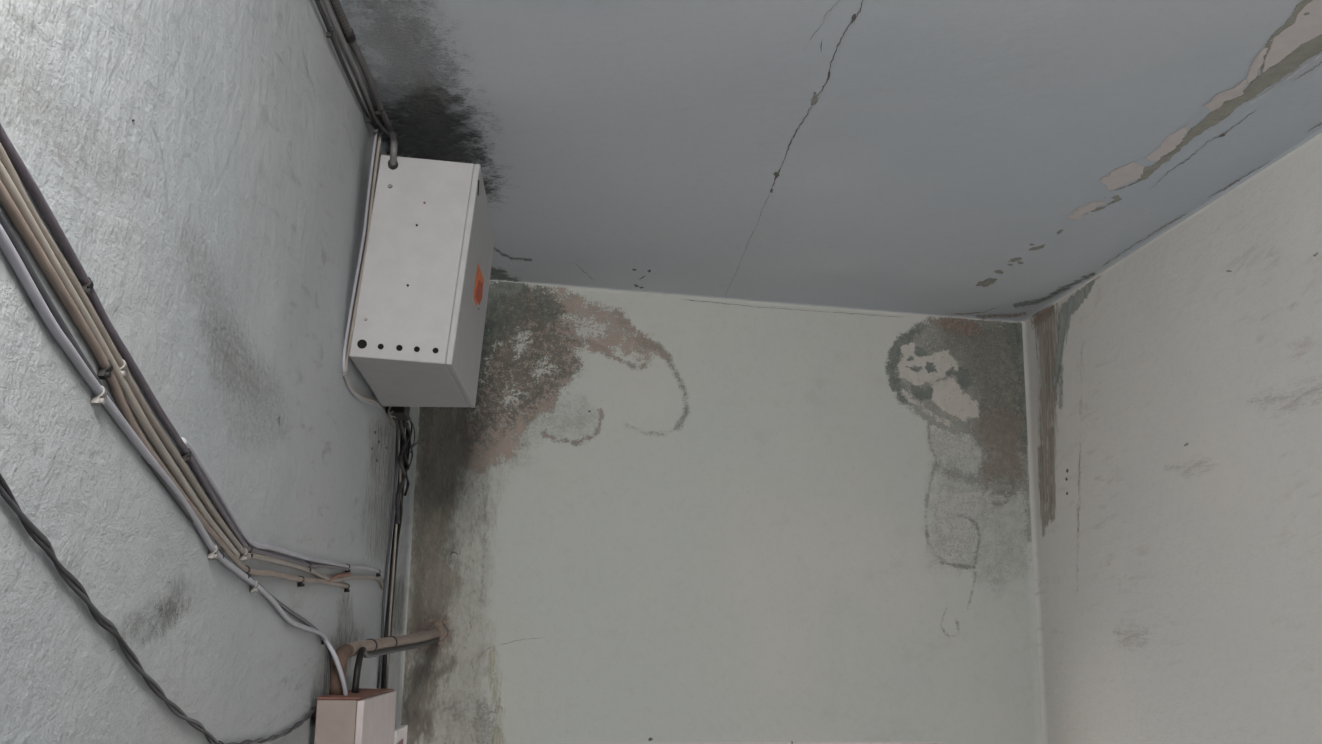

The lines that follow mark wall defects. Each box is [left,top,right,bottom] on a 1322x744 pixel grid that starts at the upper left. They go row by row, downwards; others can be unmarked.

damp [377,54,491,163]
crack [690,0,896,317]
peeling [976,0,1322,287]
damp [392,249,688,744]